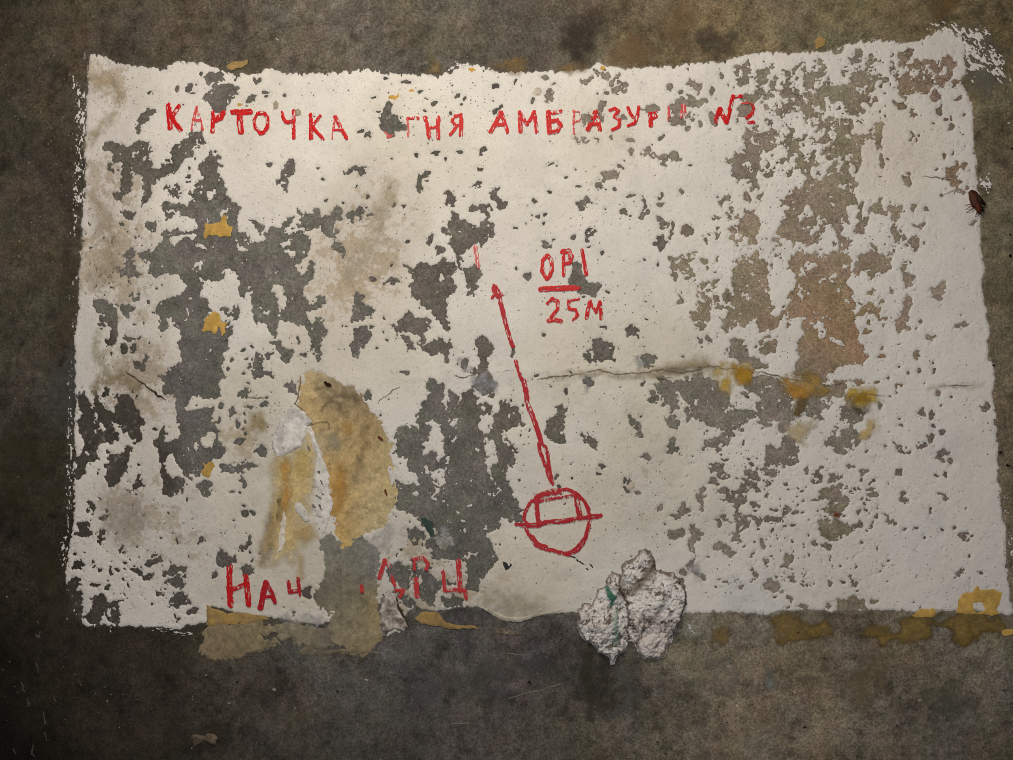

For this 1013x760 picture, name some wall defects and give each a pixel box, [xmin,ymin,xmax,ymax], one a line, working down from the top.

peeling [357,77,413,139]
peeling [531,75,556,104]
peeling [564,43,974,612]
peeling [67,108,531,661]
crack [539,365,882,396]
peeling [544,388,568,444]